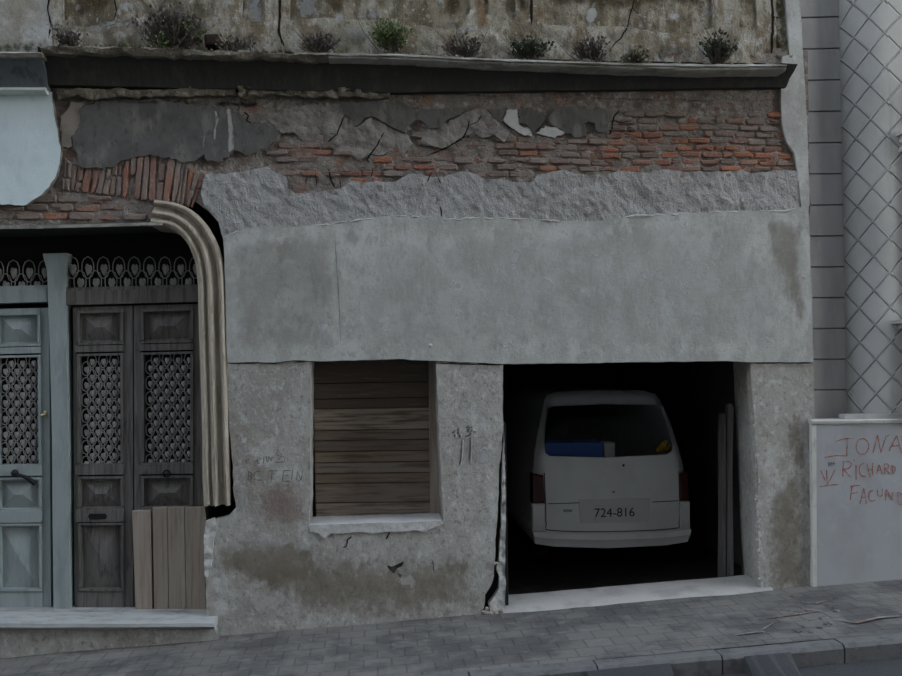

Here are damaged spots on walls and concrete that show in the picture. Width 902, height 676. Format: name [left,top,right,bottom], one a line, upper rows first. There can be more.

crack [611,4,638,49]
peeling [0,98,796,221]
damp [224,546,466,615]